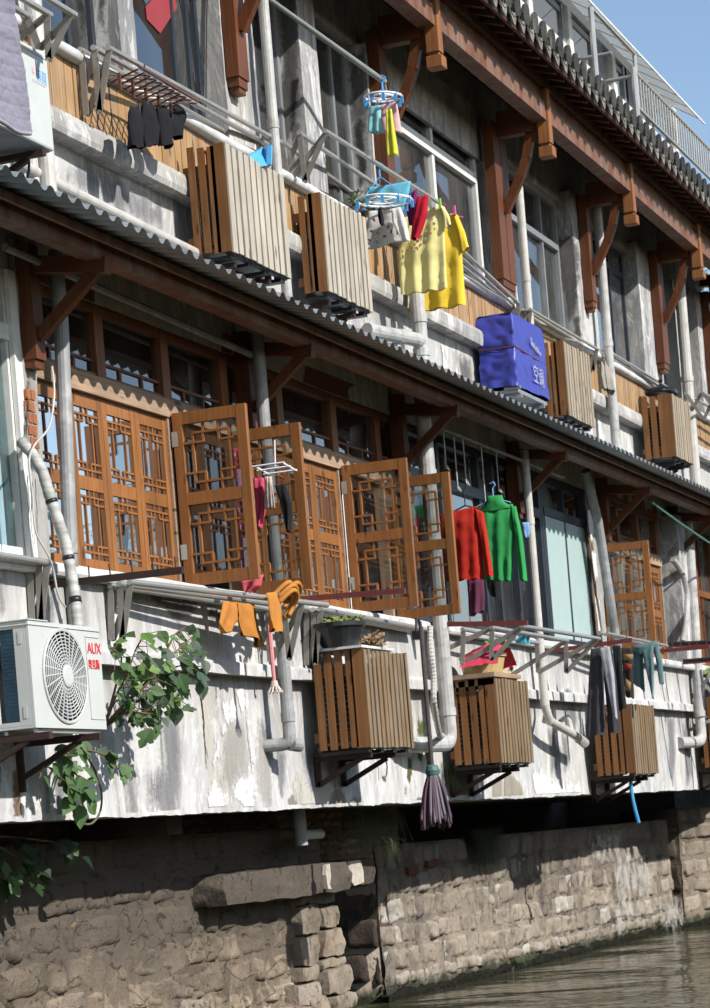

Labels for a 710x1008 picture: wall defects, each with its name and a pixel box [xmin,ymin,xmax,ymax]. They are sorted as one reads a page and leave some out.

water stain [126,720,180,812]
flaking render [206,687,272,807]
water stain [593,833,653,933]
water stain [660,904,682,924]